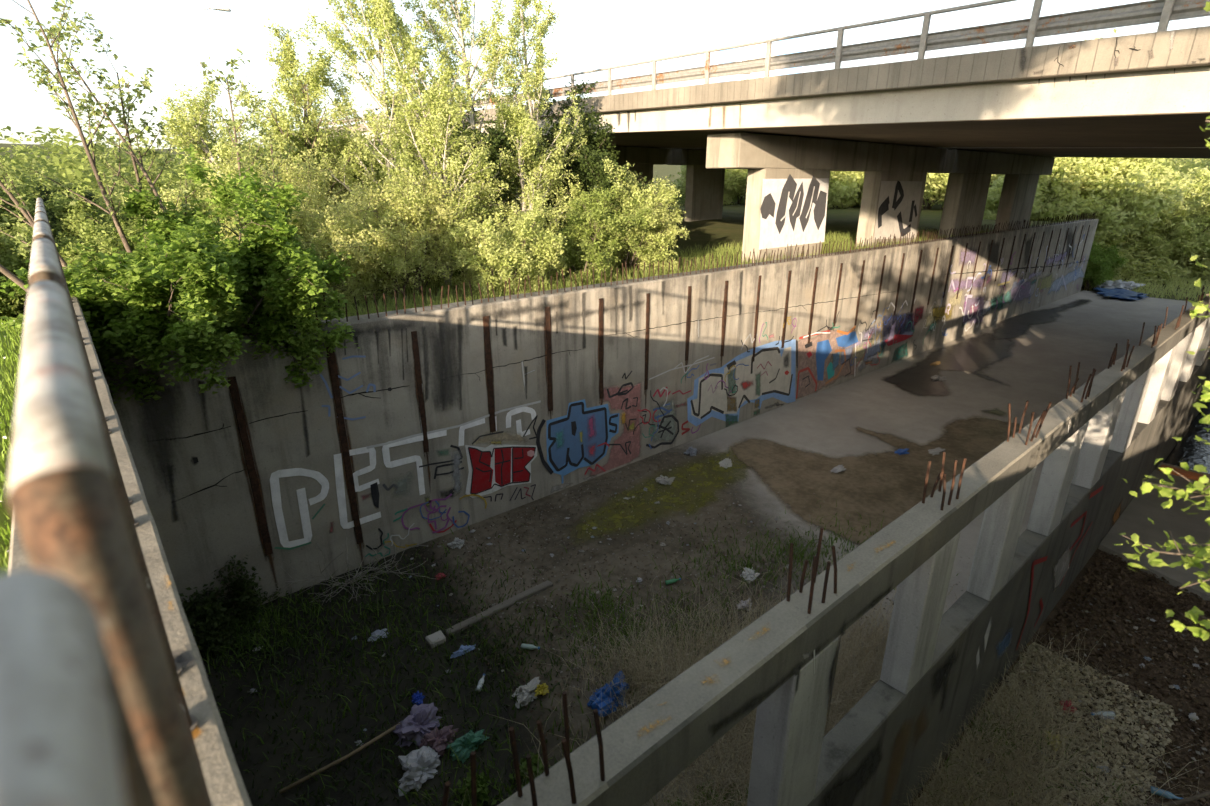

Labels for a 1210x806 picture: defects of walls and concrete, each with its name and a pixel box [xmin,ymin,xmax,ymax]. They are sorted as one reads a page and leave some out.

water stain [330,286,641,410]
crack [147,410,308,442]
crack [171,469,245,503]